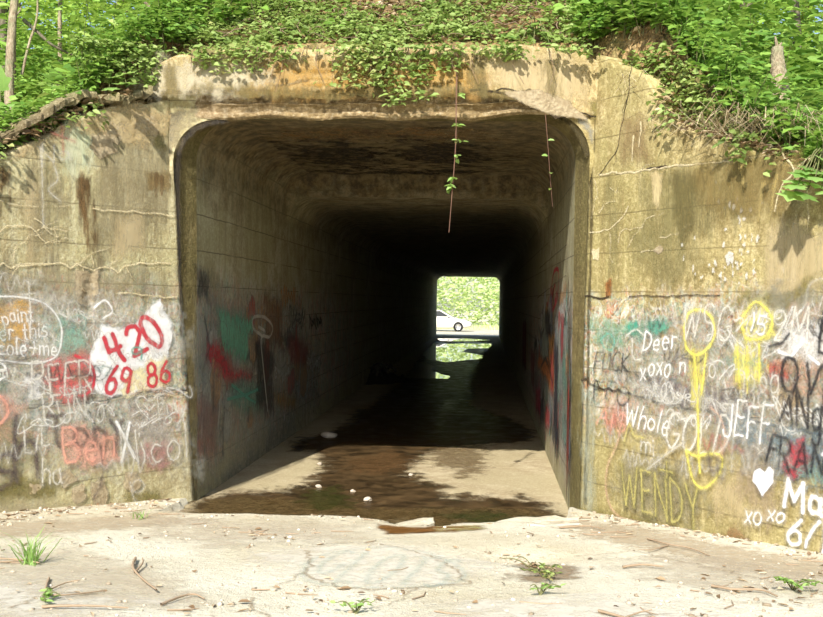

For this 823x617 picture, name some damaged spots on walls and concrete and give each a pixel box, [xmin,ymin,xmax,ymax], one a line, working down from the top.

spalling [505,90,587,119]
crack [590,62,685,253]
corrosion [77,175,98,244]
crack [300,542,471,604]